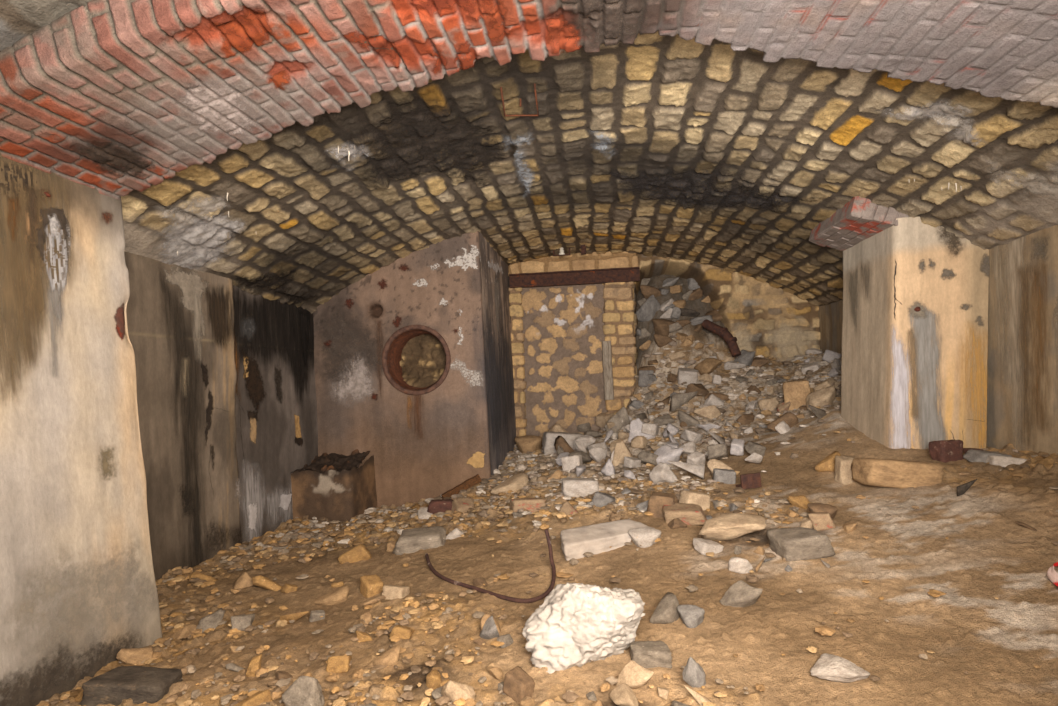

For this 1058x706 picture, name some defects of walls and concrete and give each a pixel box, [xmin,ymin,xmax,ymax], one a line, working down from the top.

spalling [343,31,401,69]
spalling [430,40,480,74]
spalling [412,0,510,43]
spalling [547,15,581,54]
leakage [890,100,978,145]
leakage [327,144,369,159]
leakage [990,163,1058,200]
leakage [161,197,244,269]
leakage [0,153,73,392]
leakage [334,359,372,399]
leakage [161,279,293,568]